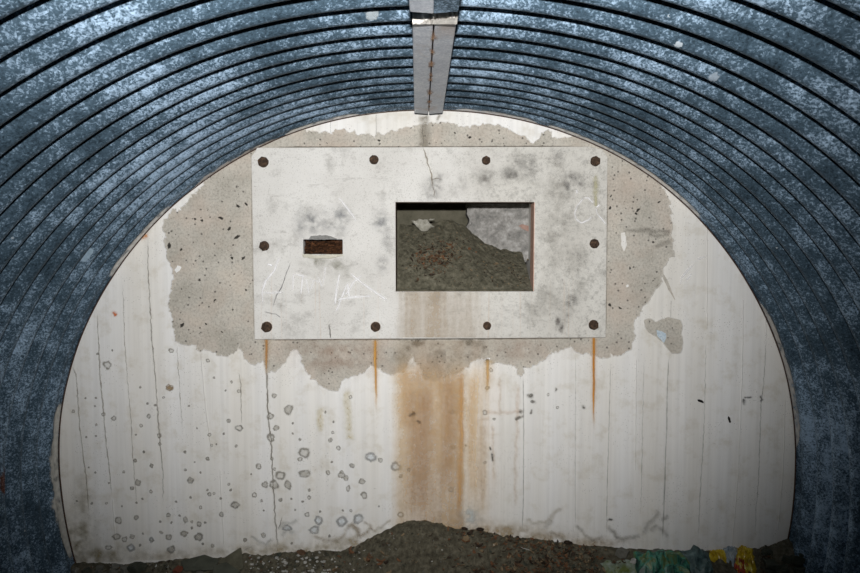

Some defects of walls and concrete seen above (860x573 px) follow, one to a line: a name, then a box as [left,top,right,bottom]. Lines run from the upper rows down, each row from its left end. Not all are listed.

peeling [162,121,683,392]
rust [400,372,477,529]